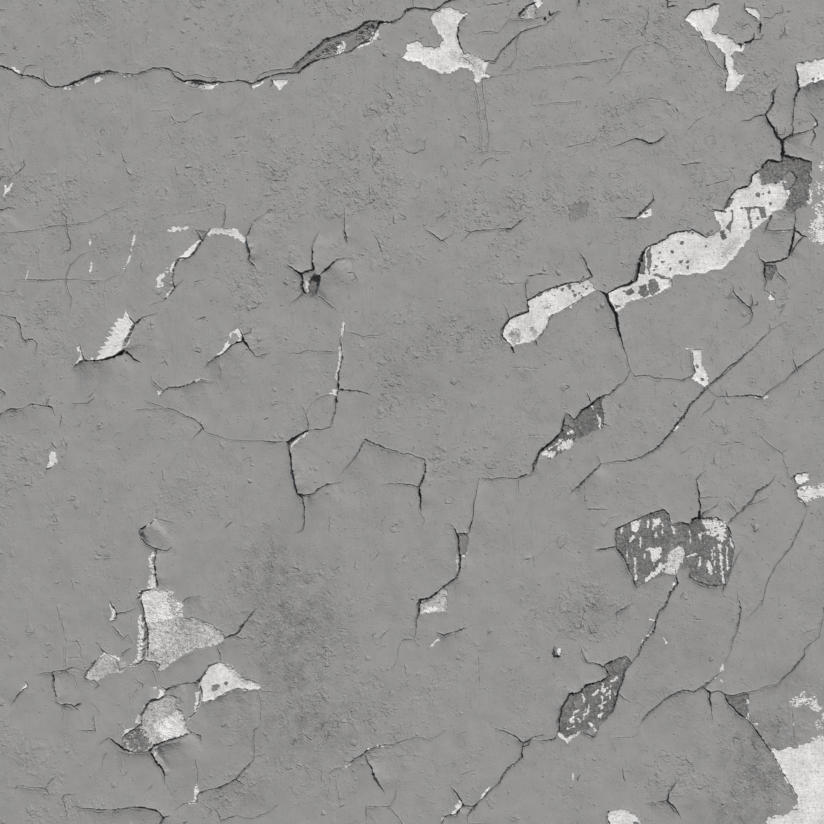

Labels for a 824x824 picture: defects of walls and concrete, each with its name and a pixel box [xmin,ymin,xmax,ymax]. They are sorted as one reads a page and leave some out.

crack [1,0,451,90]
peeling [402,7,491,83]
peeling [685,2,783,92]
peeling [608,156,812,312]
peeling [502,252,596,354]
crack [133,321,439,533]
crack [569,287,823,496]
crack [392,478,480,673]
peeling [596,471,743,595]
peeling [36,509,281,782]
crack [467,724,556,820]
peeling [766,691,824,824]